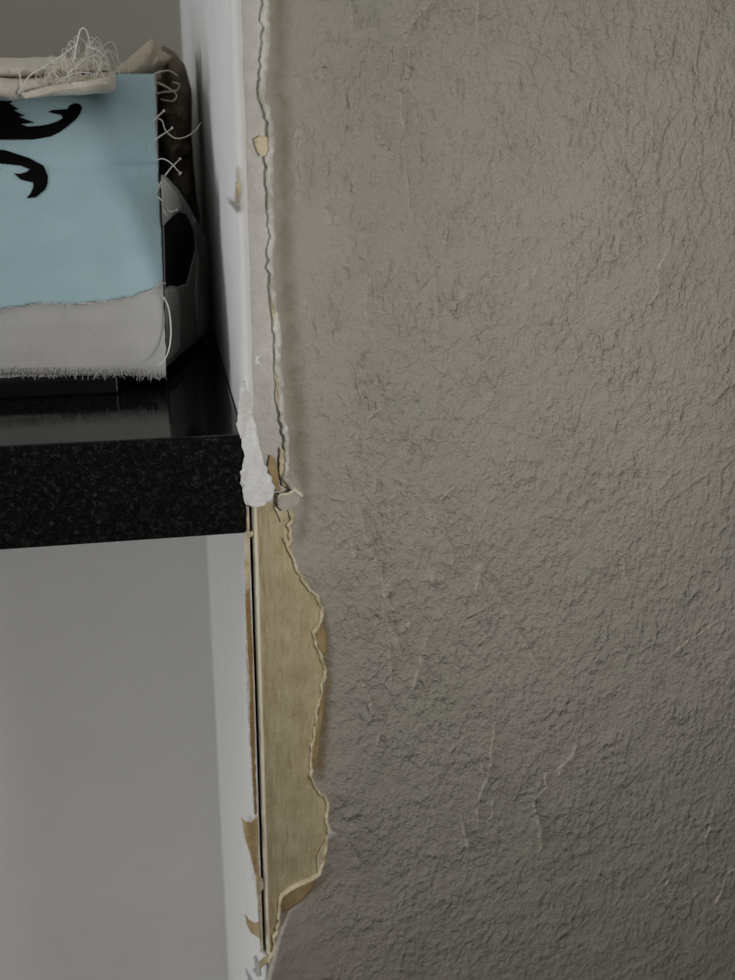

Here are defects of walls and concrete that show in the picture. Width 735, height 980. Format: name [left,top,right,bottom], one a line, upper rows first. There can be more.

peeling [231,0,337,969]